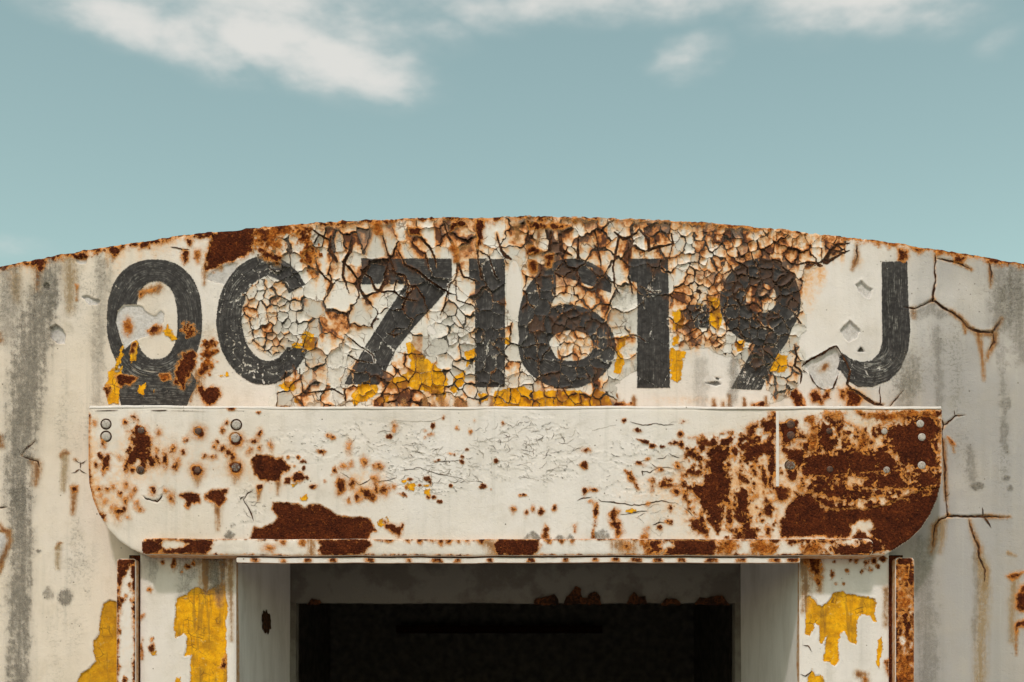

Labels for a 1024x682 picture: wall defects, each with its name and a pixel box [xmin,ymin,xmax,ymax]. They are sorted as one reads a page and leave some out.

spalling [207,263,237,284]
corrosion [0,215,808,312]
crack [308,222,674,316]
peeling [237,216,863,407]
crack [797,242,850,267]
corrosion [822,235,1024,286]
crack [905,256,1004,377]
corrosion [60,321,955,682]
crack [930,410,1010,682]
peeling [77,600,117,682]
peeling [173,586,228,682]
peeling [804,591,877,666]